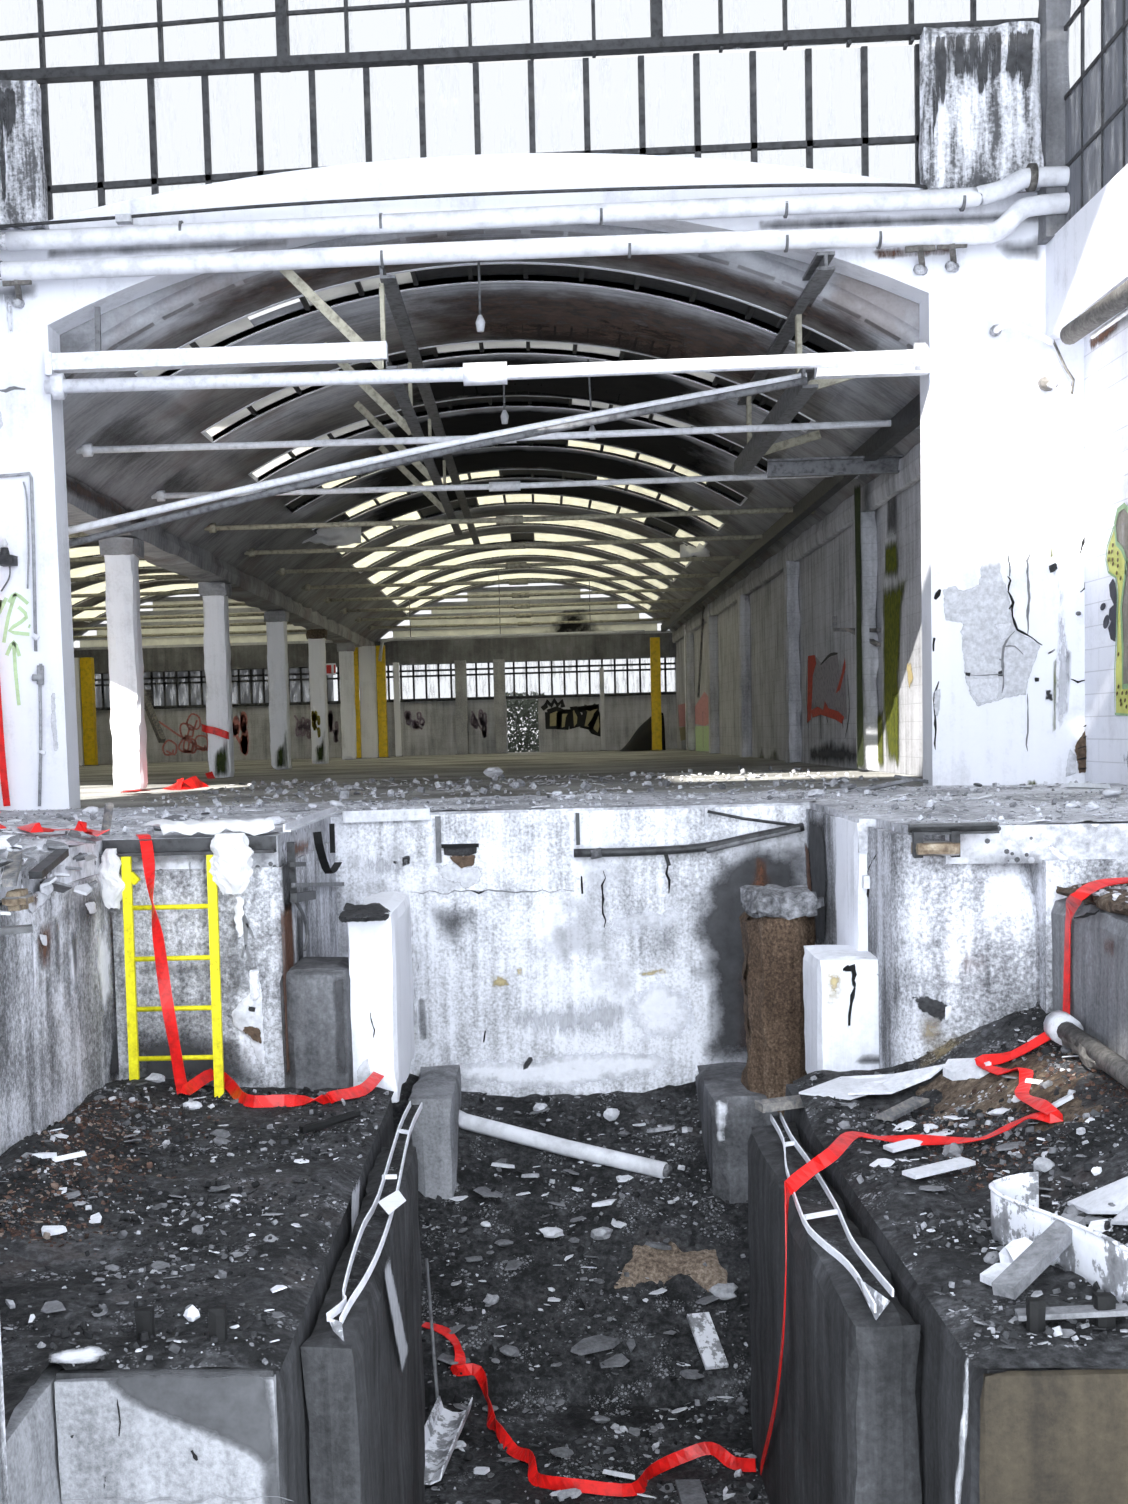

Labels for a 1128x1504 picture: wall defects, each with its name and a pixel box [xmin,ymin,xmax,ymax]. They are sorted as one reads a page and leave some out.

water stain [0,88,20,202]
water stain [929,29,1041,141]
flaking render [943,545,1053,706]
crack [932,544,1085,751]
crack [1078,535,1086,592]
water stain [697,819,827,1059]